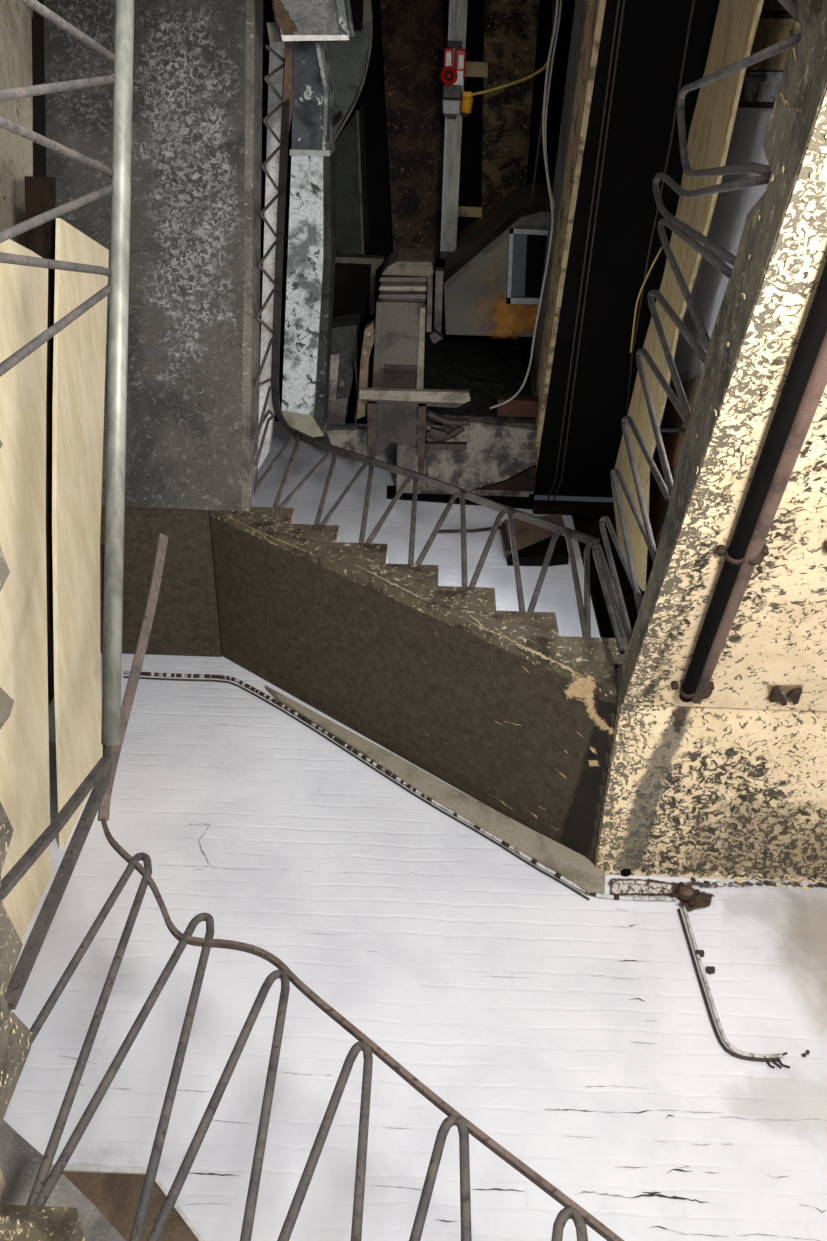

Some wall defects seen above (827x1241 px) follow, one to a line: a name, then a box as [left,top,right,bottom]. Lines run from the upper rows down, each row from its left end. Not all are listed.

rust [492,296,539,337]
peeling [563,674,614,734]
crack [159,824,261,870]
crack [546,1086,827,1241]
crack [475,1186,523,1194]